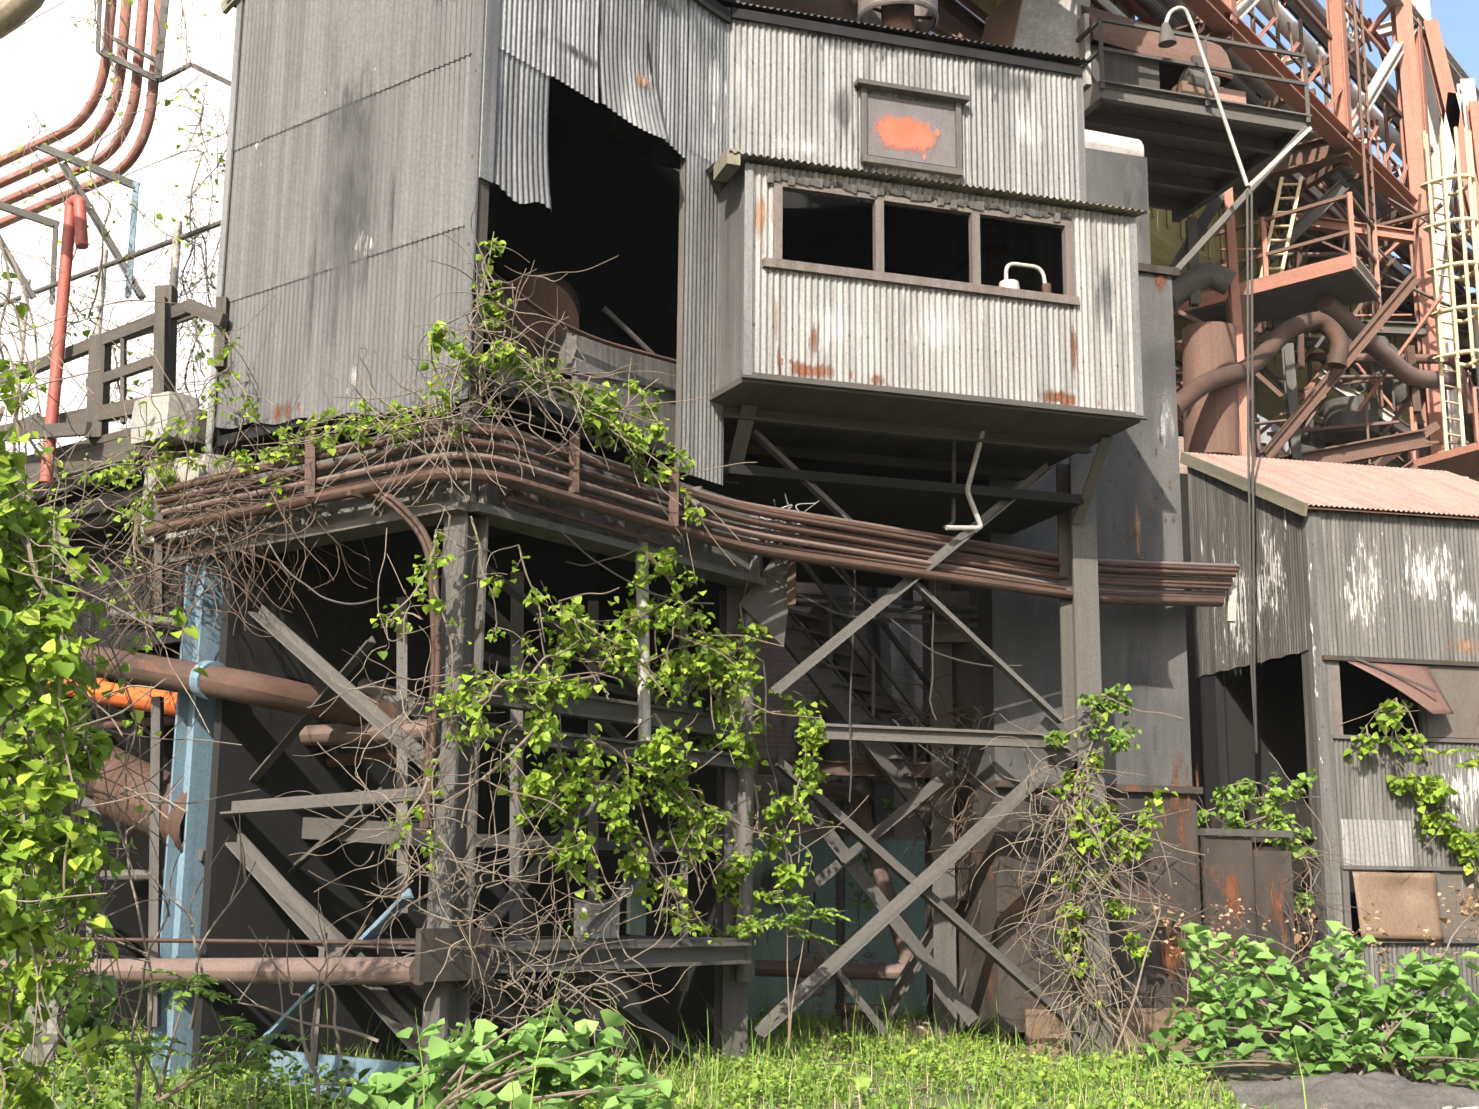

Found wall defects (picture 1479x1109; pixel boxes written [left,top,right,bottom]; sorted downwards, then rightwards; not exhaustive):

rust [777,321,852,379]
rust [1037,390,1075,405]
peeling [1340,531,1479,638]
rust [1216,872,1241,926]